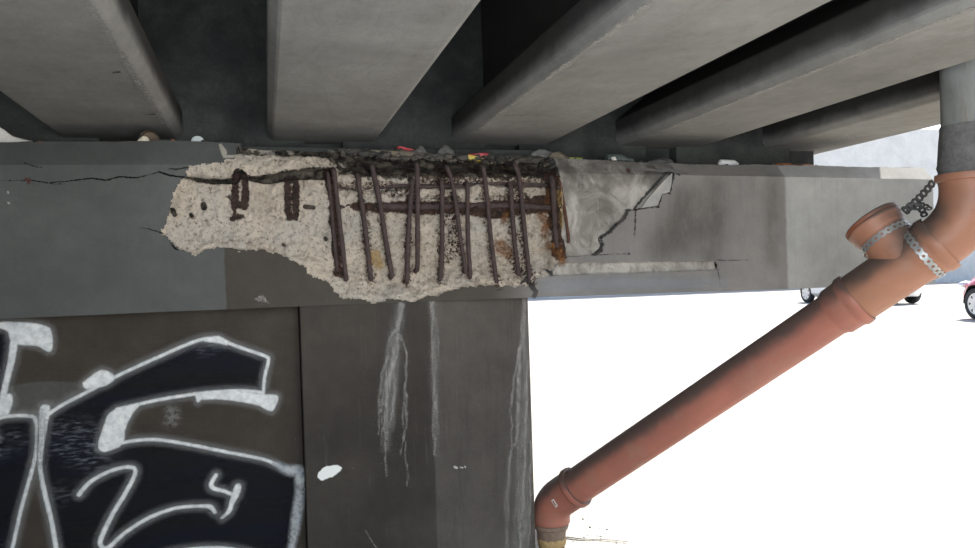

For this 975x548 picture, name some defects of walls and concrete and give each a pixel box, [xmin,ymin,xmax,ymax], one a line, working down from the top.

crack [9,162,189,184]
spalling [161,144,720,304]
corrosion [322,165,567,290]
crack [592,172,680,256]